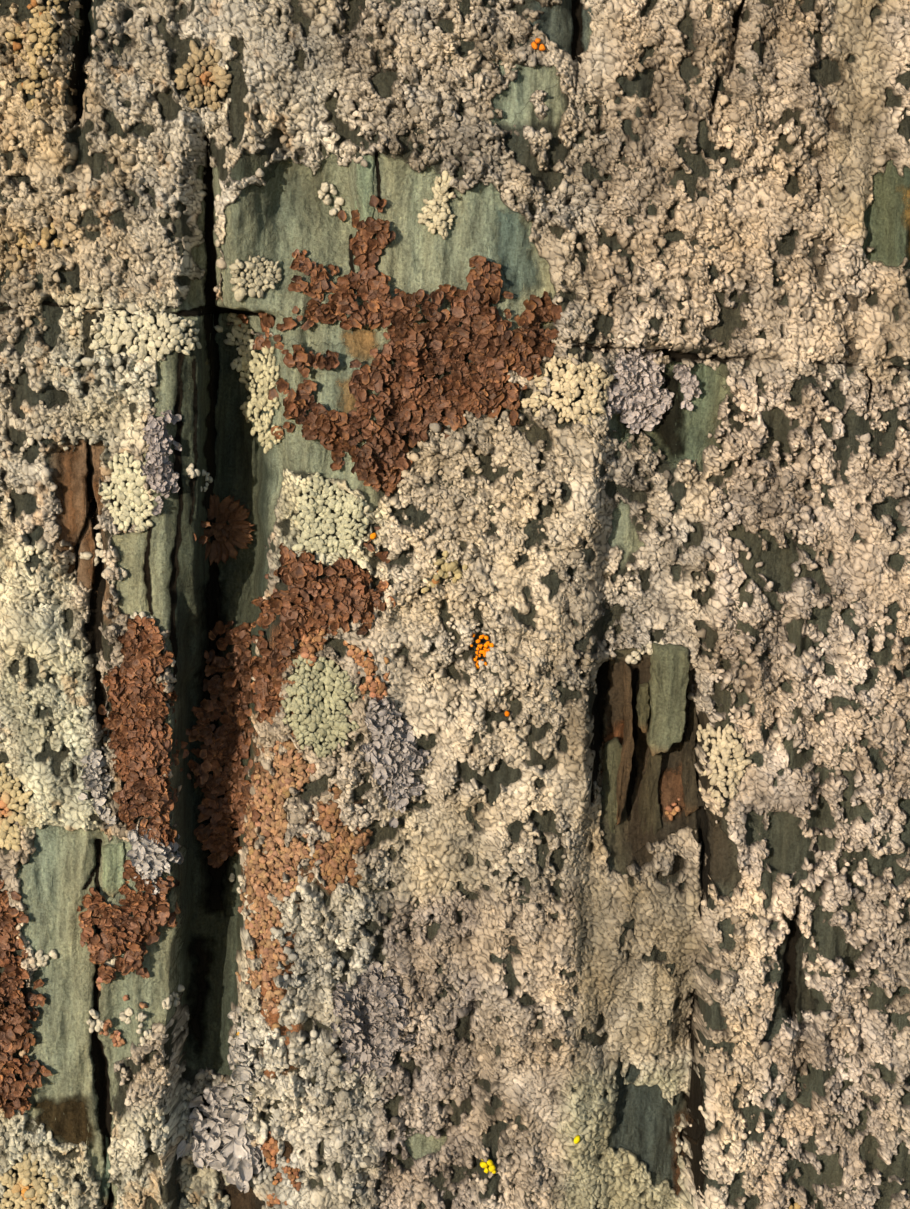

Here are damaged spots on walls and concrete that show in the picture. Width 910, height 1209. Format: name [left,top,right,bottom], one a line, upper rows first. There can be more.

crack [74,439,111,746]
crack [143,134,276,685]